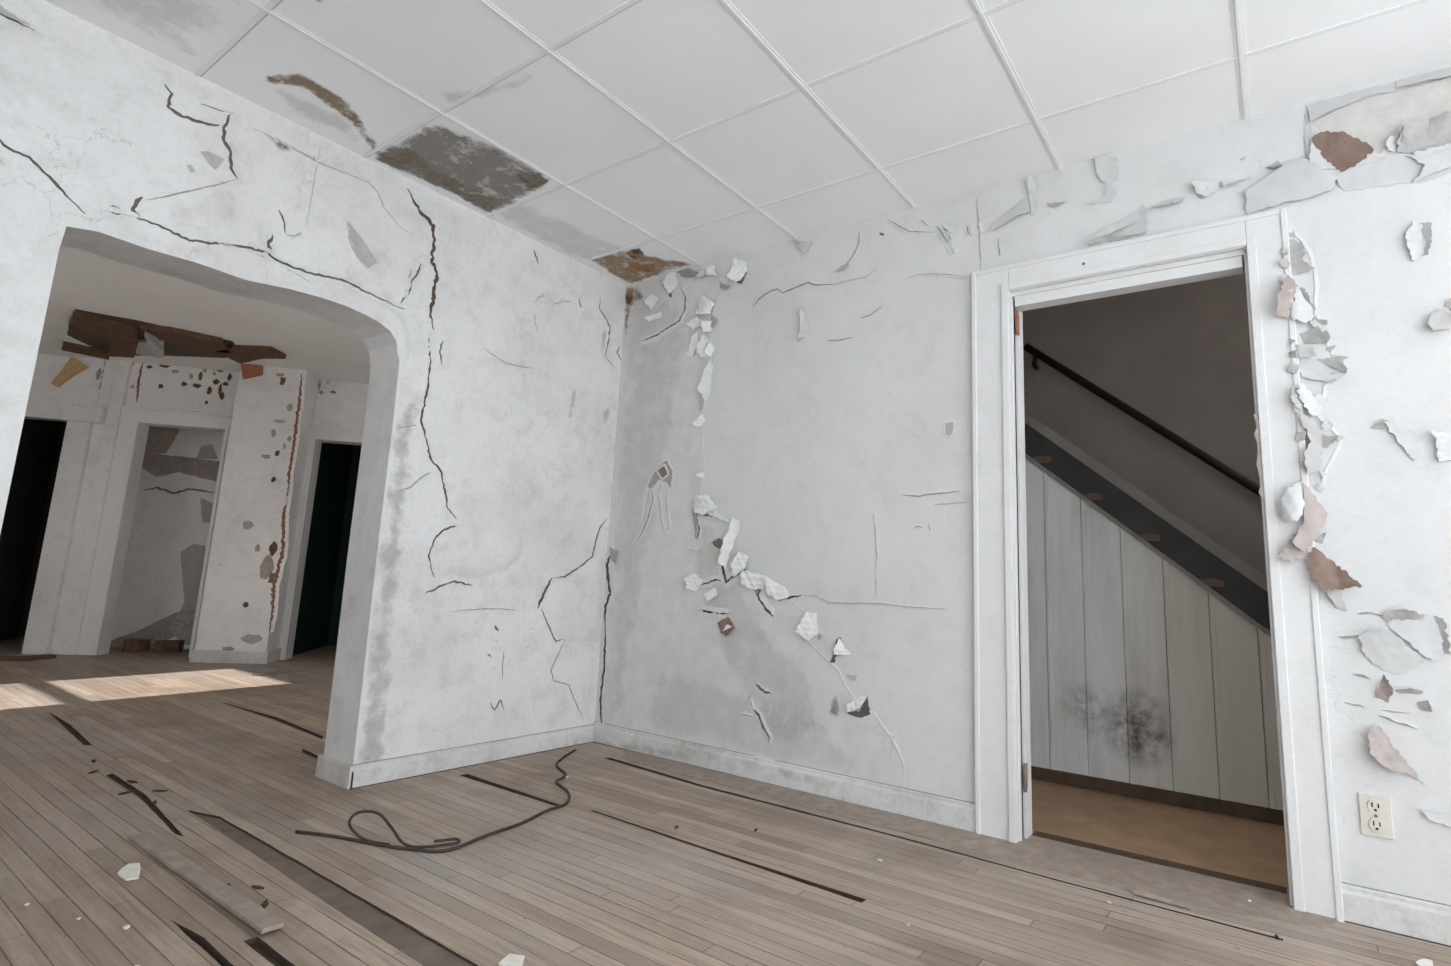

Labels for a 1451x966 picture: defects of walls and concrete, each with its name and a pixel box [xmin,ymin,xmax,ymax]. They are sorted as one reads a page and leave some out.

crack [0,4,38,35]
peeling [67,309,336,651]
crack [0,84,621,724]
peeling [603,258,906,788]
peeling [991,177,1067,230]
peeling [1083,67,1451,246]
peeling [1276,229,1451,784]
peeling [1405,221,1432,261]